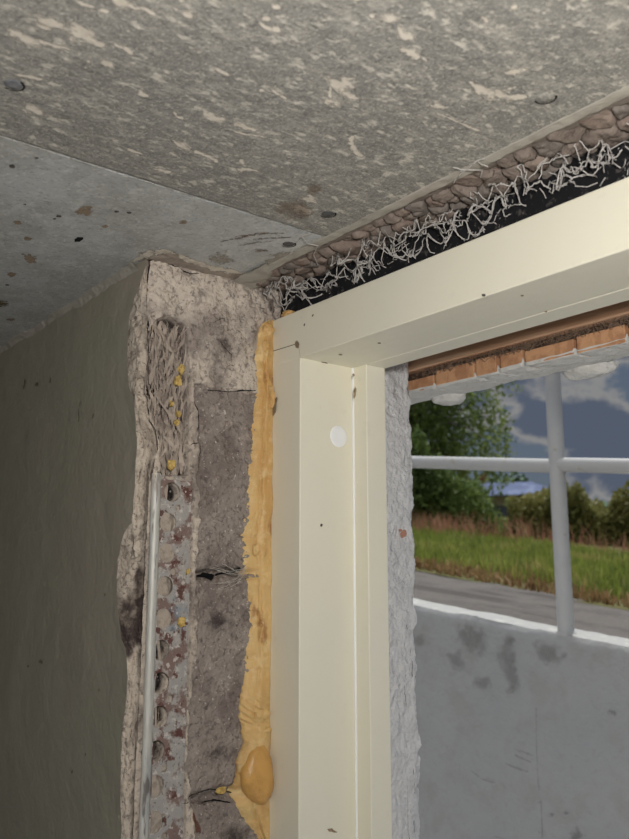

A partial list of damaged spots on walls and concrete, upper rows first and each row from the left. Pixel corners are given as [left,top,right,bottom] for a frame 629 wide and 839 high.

flaking render [116,260,157,839]